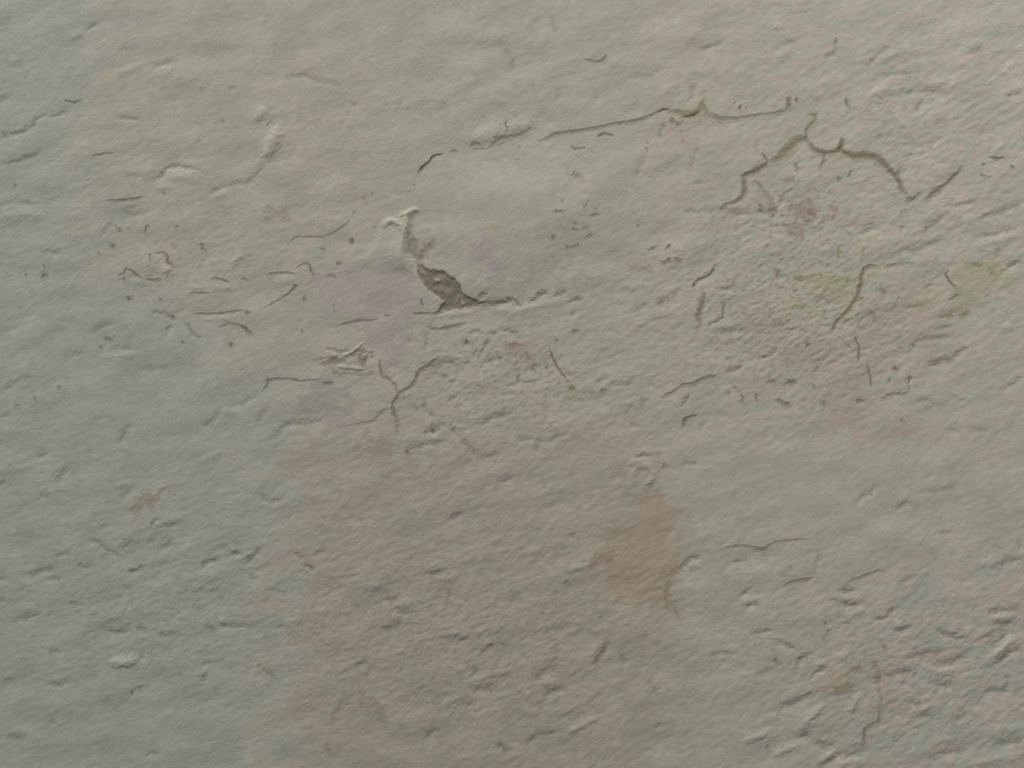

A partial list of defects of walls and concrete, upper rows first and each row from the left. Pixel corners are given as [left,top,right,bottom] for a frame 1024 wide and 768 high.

crack [416,93,962,210]
peeling [347,205,480,315]
crack [261,376,335,392]
crack [333,289,584,436]
crack [829,260,913,401]
damp [583,481,697,620]